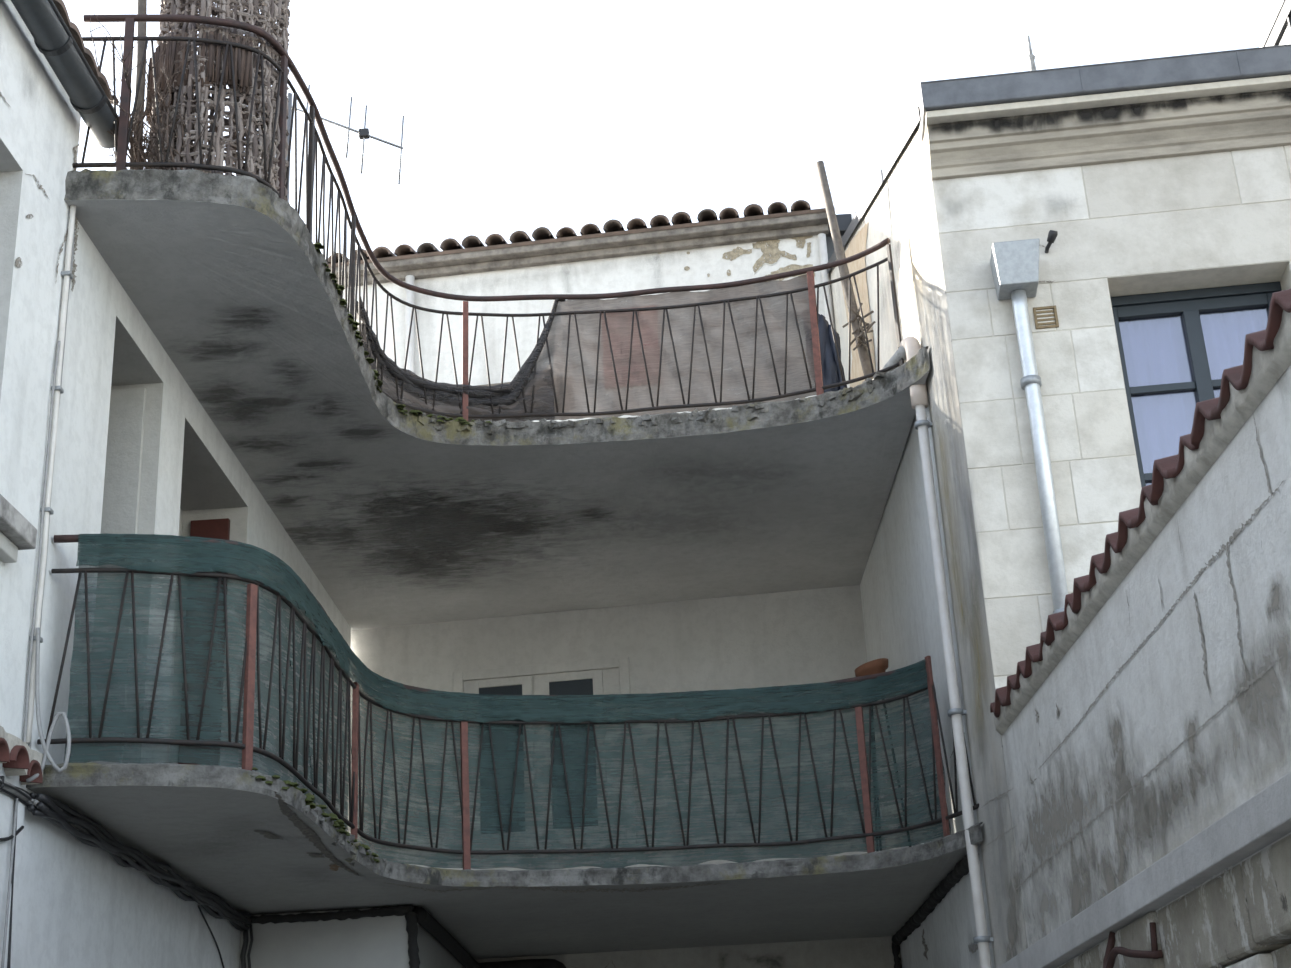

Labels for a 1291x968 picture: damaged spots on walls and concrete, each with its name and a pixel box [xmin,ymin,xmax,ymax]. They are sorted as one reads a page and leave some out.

water stain [934,90,1291,131]
spalling [417,223,886,435]
water stain [300,497,543,575]
water stain [1268,584,1280,614]
crack [981,414,1283,891]
water stain [1236,633,1289,728]
water stain [1007,719,1249,958]